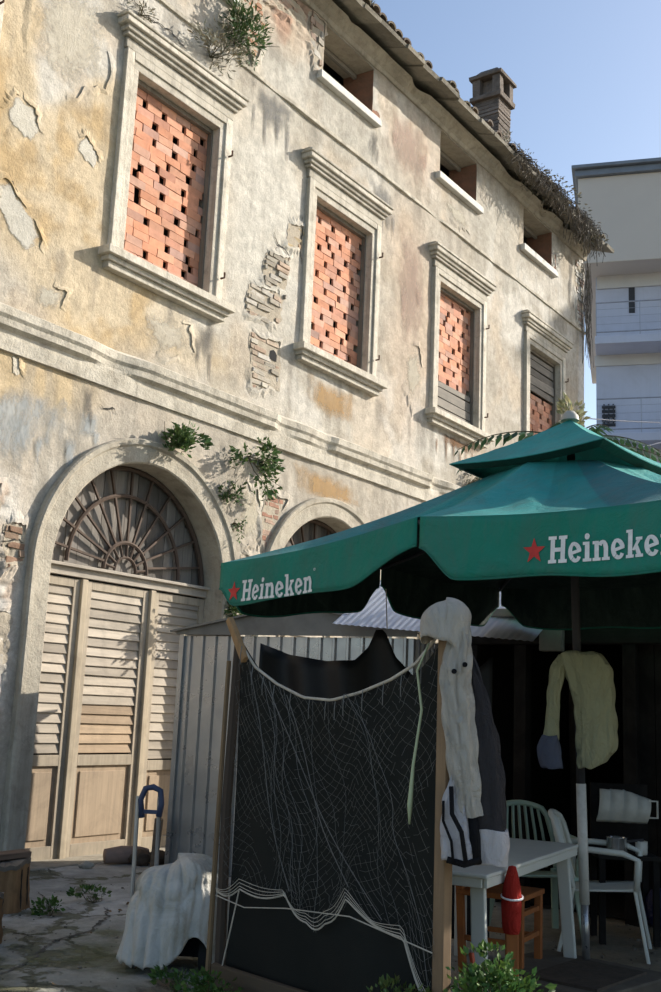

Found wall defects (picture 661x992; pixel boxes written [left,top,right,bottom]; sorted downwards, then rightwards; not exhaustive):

flaking render [236,0,328,77]
peeling [0,86,46,139]
peeling [77,128,104,168]
water stain [253,94,289,154]
peeling [0,170,48,255]
flaking render [242,215,305,399]
flaking render [0,477,31,581]
flaking render [0,602,16,674]
crack [1,891,111,974]